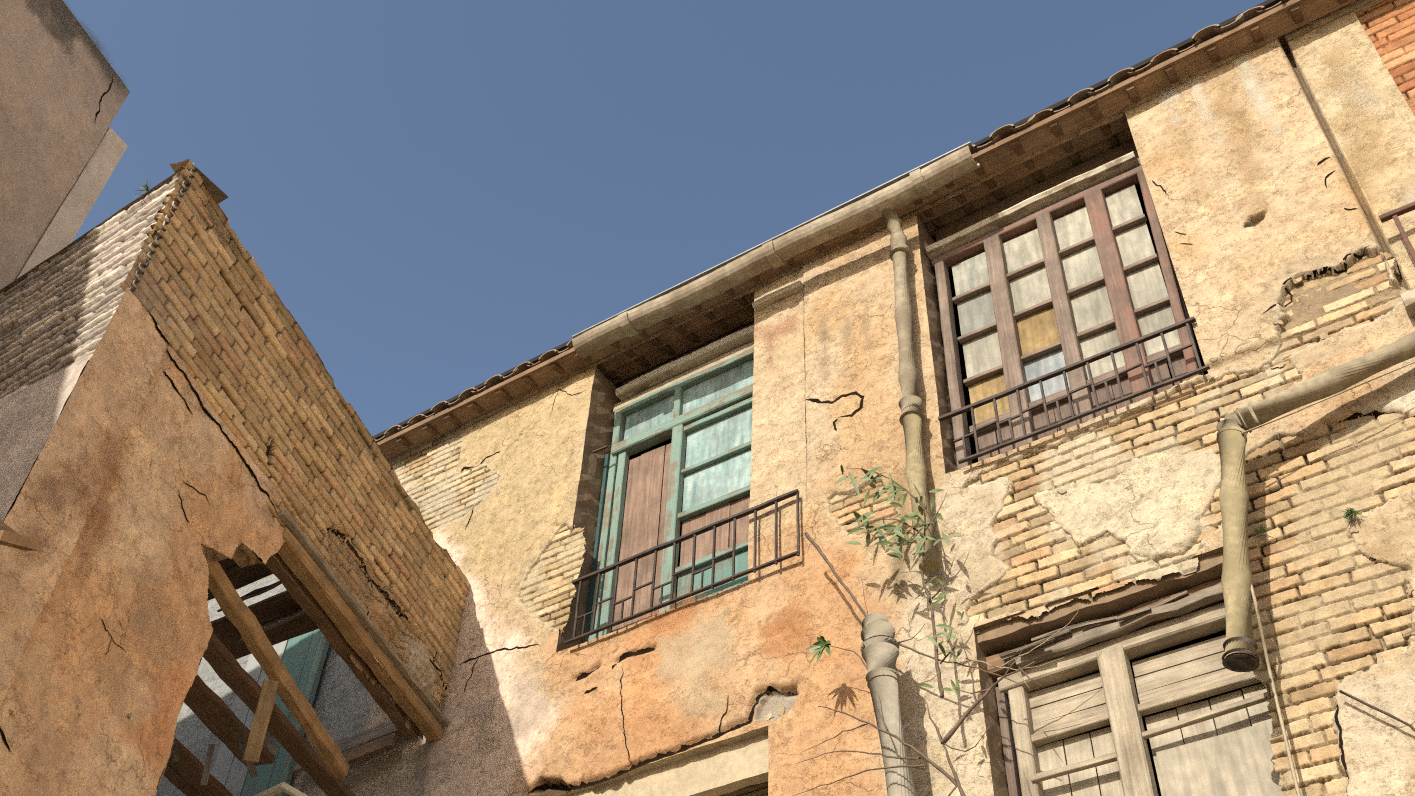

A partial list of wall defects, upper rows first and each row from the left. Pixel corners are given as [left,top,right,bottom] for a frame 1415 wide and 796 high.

crack [95,79,113,121]
crack [141,302,278,514]
crack [803,292,864,477]
spalling [967,251,1410,634]
crack [1338,410,1415,423]
crack [179,482,209,523]
crack [327,528,411,624]
spalling [519,525,586,634]
crack [527,647,798,794]
crack [1333,694,1349,796]